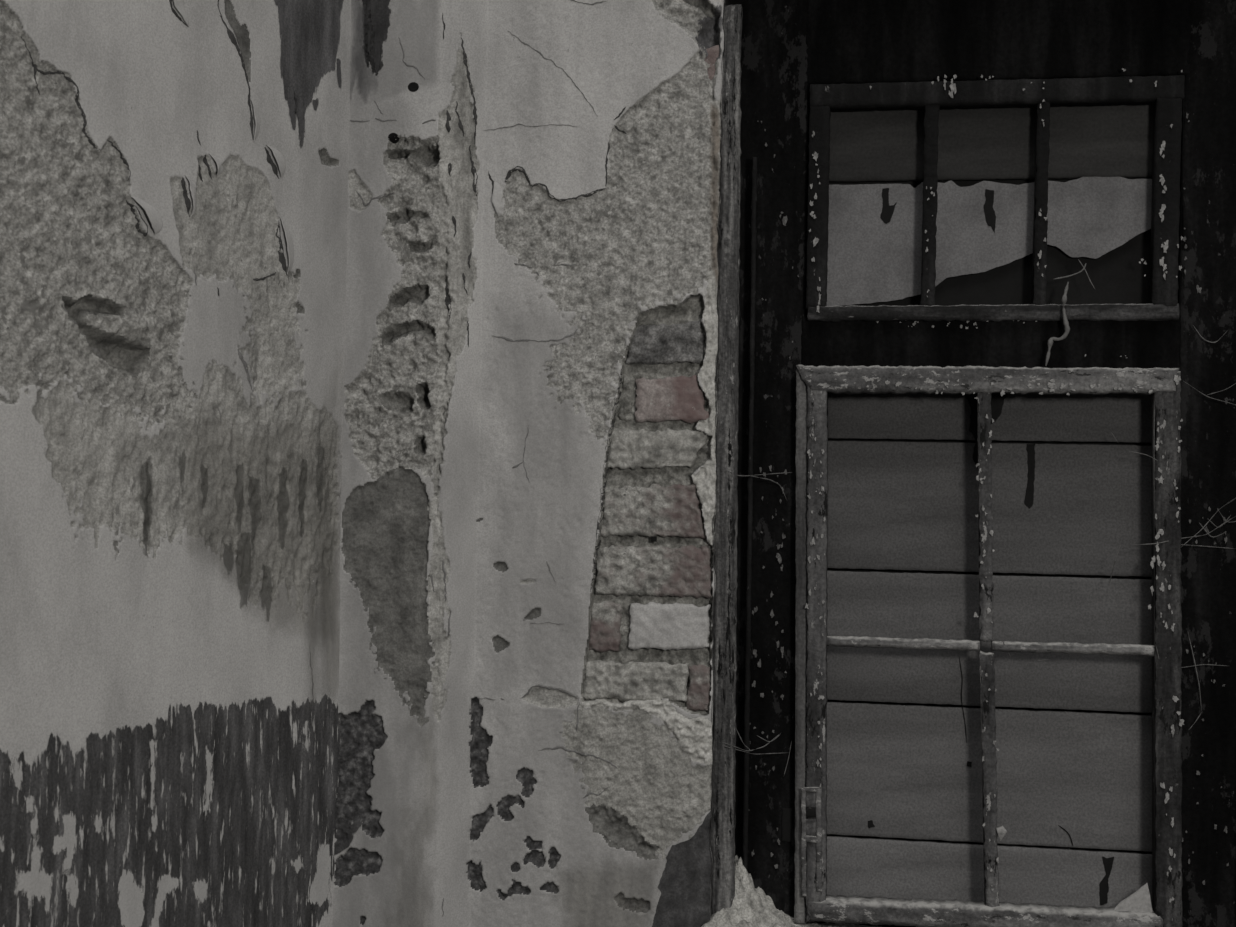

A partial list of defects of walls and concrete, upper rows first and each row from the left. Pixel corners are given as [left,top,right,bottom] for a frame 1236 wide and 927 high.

flaking render [0,0,480,722]
flaking render [492,0,722,716]
peeling [0,694,388,927]
peeling [469,697,493,788]
peeling [470,767,537,840]
peeling [466,836,561,901]